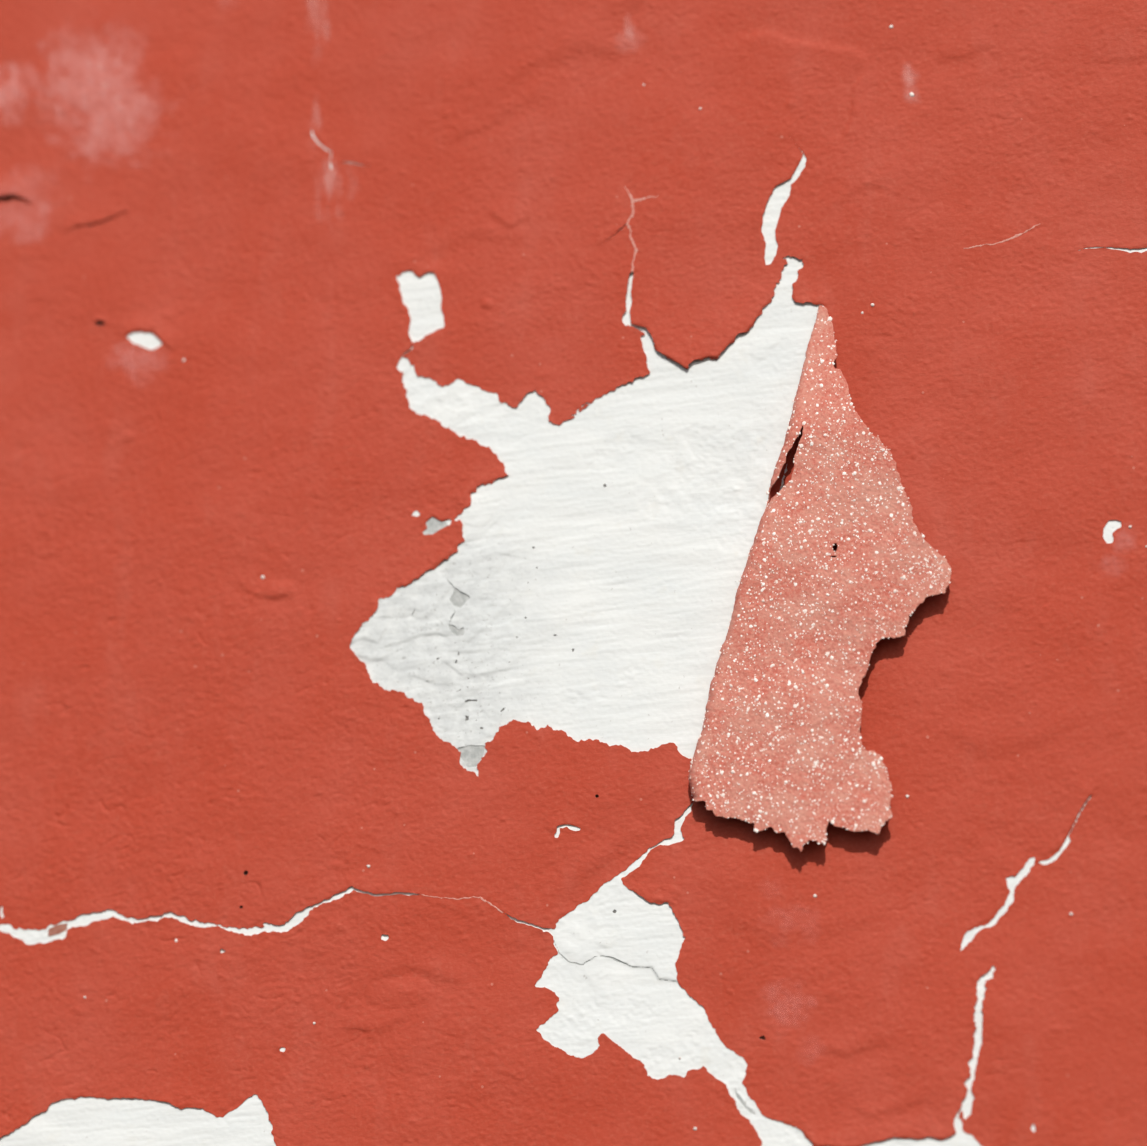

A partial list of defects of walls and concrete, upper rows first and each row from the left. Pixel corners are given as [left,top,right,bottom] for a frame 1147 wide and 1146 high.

crack [0,195,31,203]
peeling [127,332,162,350]
peeling [1103,520,1121,543]
peeling [350,137,952,1146]
crack [961,795,1092,951]
crack [0,886,544,945]
crack [957,966,995,1119]
peeling [0,1094,276,1146]
peeling [863,1114,981,1146]